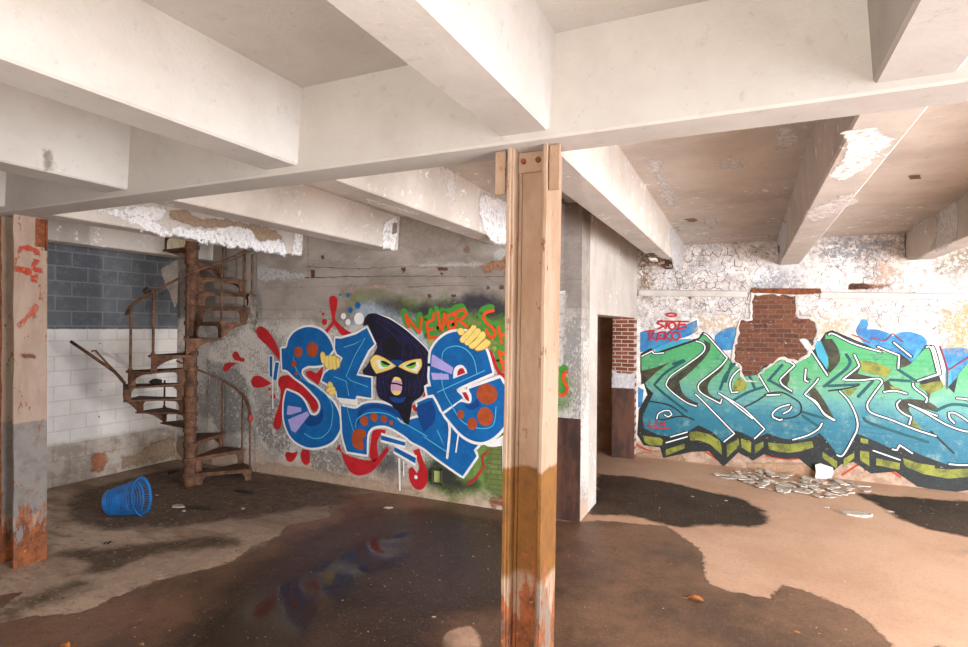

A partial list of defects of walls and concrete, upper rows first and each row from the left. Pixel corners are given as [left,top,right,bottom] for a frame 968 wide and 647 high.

peeling [828,127,895,181]
peeling [98,205,303,255]
peeling [257,265,307,283]
crack [640,243,770,317]
crack [816,234,943,331]
flaking render [731,292,819,382]